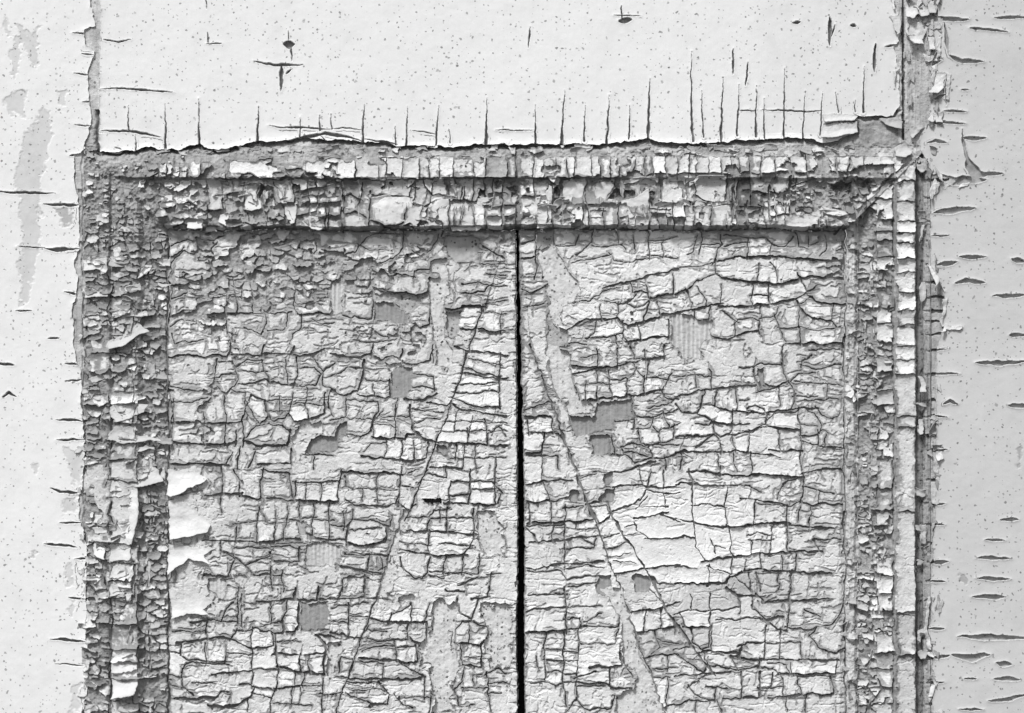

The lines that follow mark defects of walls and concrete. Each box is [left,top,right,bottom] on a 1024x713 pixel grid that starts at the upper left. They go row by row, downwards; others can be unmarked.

crack [67,31,203,158]
crack [254,103,453,146]
crack [483,77,652,145]
crack [689,42,897,144]
peeling [890,0,951,138]
crack [0,190,79,209]
crack [14,244,79,254]
crack [0,361,19,399]
crack [54,417,85,443]
peeling [75,113,948,713]
crack [166,229,847,713]
crack [42,486,86,562]